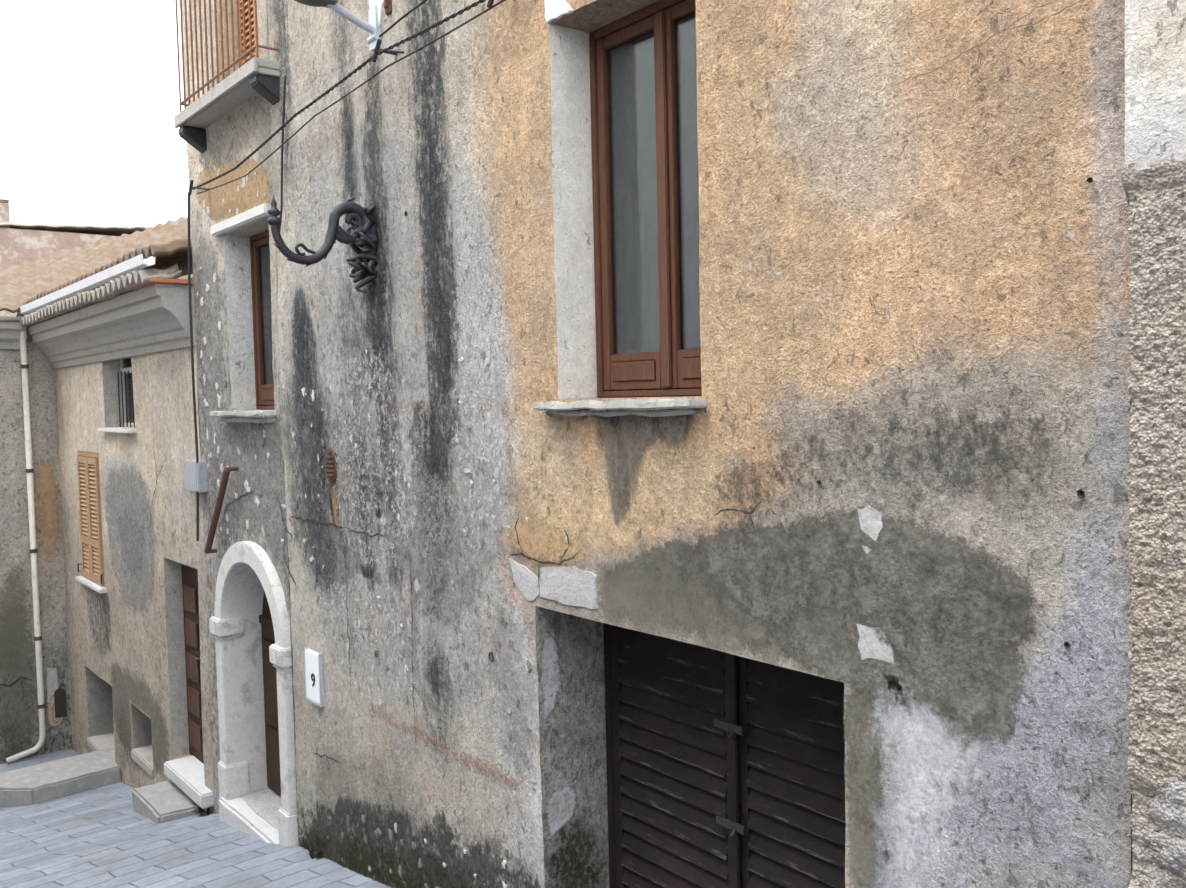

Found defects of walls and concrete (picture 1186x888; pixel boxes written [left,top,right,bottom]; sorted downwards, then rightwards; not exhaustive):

damp [274,0,293,170]
damp [333,0,461,620]
damp [292,286,337,598]
damp [0,568,37,761]
damp [88,593,111,655]
damp [106,469,154,613]
damp [111,666,169,770]
crack [508,510,578,580]
damp [585,400,1053,888]